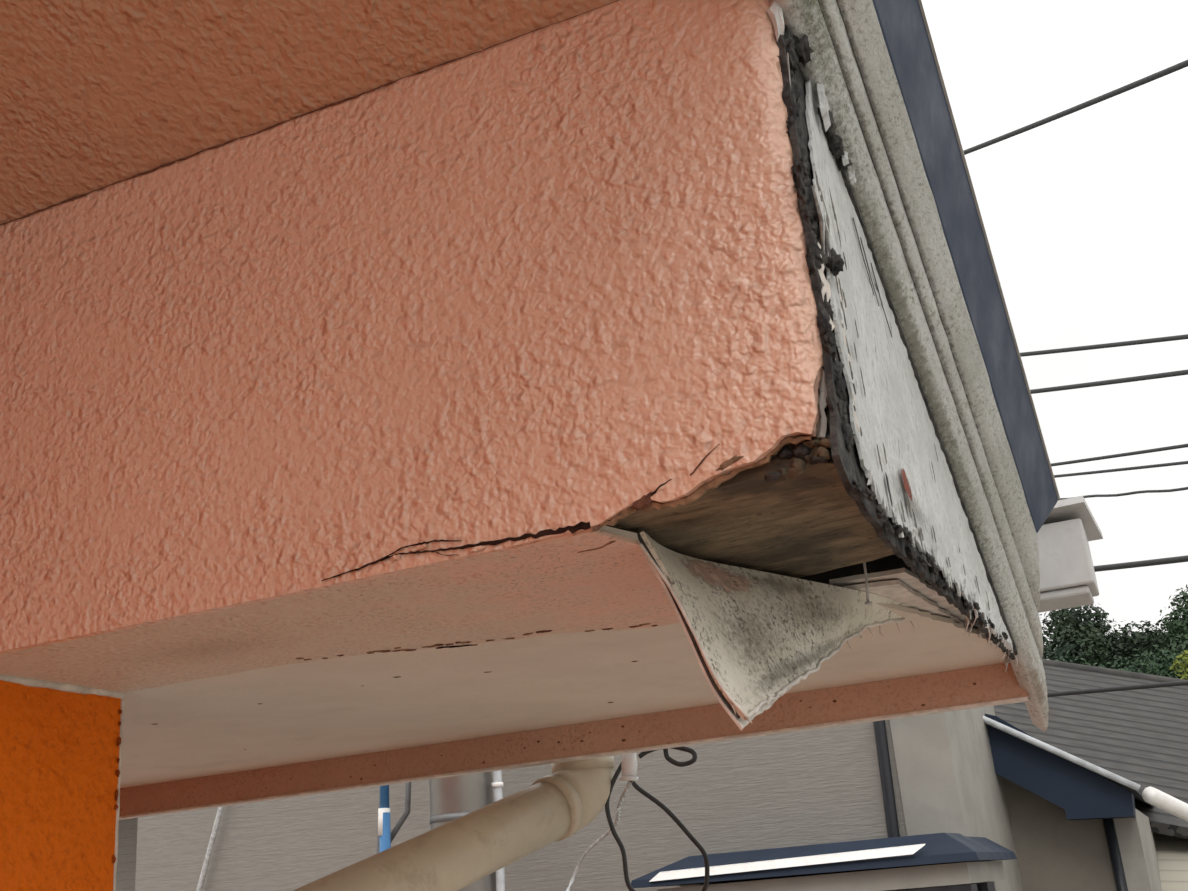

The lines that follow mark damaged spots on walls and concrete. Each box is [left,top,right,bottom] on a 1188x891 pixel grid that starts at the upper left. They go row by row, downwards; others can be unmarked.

spalling [767,0,785,41]
peeling [813,172,1002,634]
peeling [631,492,653,511]
crack [651,444,719,496]
peeling [715,455,744,471]
rust [901,469,912,501]
crack [321,521,616,581]
spalling [367,630,552,654]